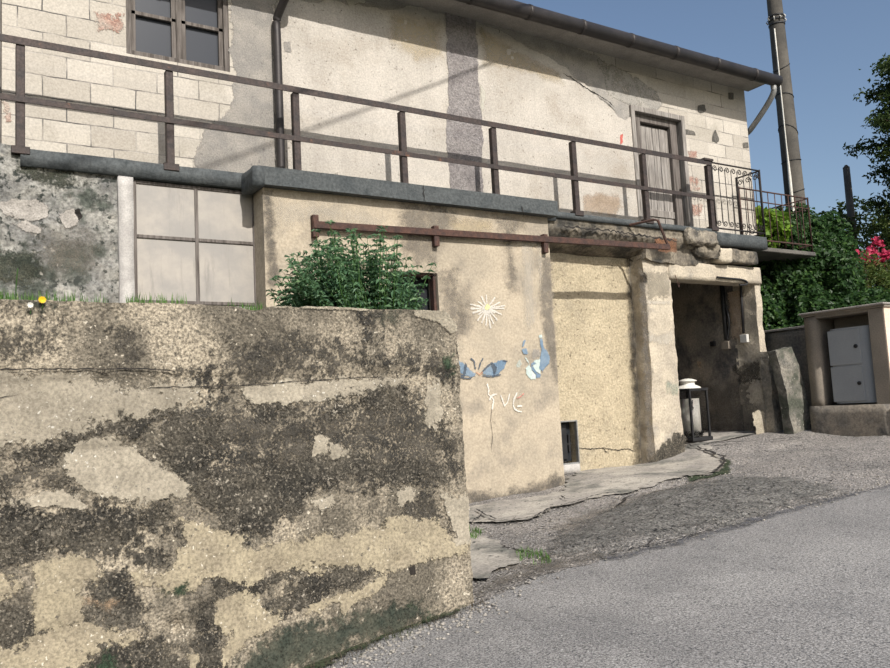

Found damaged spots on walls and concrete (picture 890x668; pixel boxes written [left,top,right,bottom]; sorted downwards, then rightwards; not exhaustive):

flaking render [94,11,125,33]
damp [16,166,88,189]
damp [0,248,43,289]
damp [403,205,489,261]
damp [506,219,523,284]
damp [540,257,556,371]
crack [0,368,375,388]
damp [0,306,465,668]
crack [473,437,792,535]